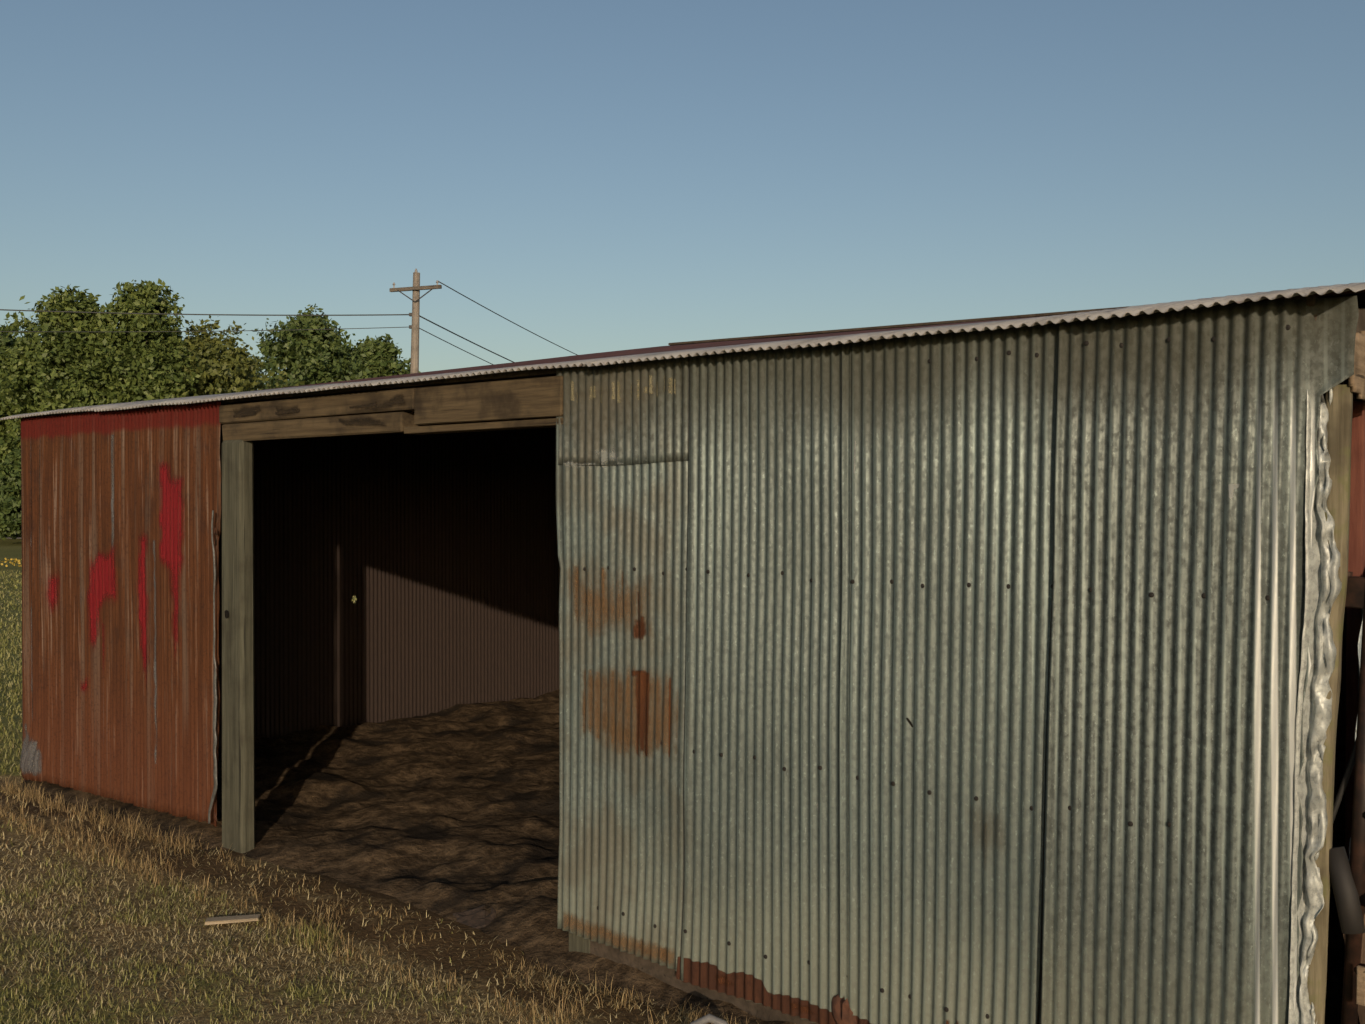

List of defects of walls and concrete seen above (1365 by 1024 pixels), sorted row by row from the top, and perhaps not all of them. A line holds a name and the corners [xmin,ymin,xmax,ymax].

corrosion [583,671,671,757]
corrosion [564,916,836,1024]